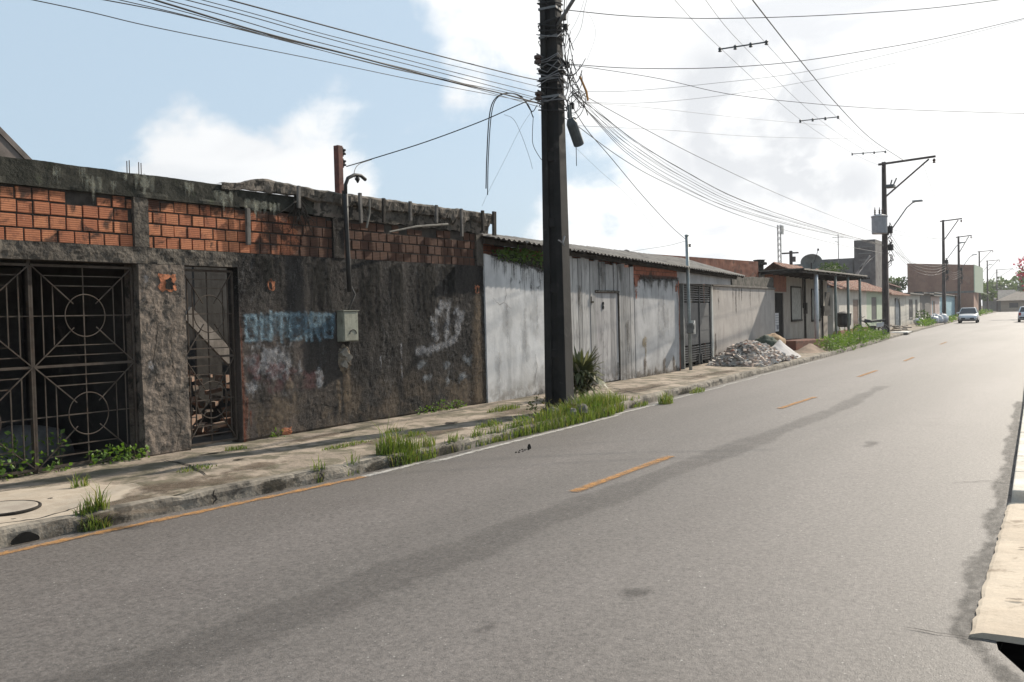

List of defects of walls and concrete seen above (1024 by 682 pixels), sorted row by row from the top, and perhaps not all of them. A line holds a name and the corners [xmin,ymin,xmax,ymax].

spalling [145,273,177,292]